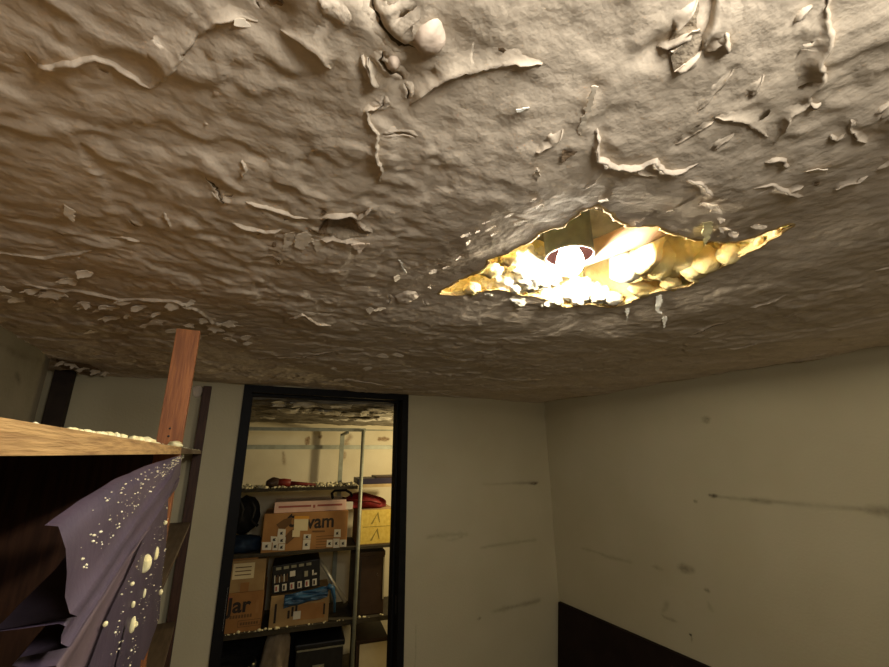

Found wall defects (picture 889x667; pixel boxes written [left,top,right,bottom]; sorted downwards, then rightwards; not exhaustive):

crack [248,0,283,9]
crack [355,0,421,182]
spalling [232,201,373,265]
peeling [461,221,497,246]
peeling [655,294,667,328]